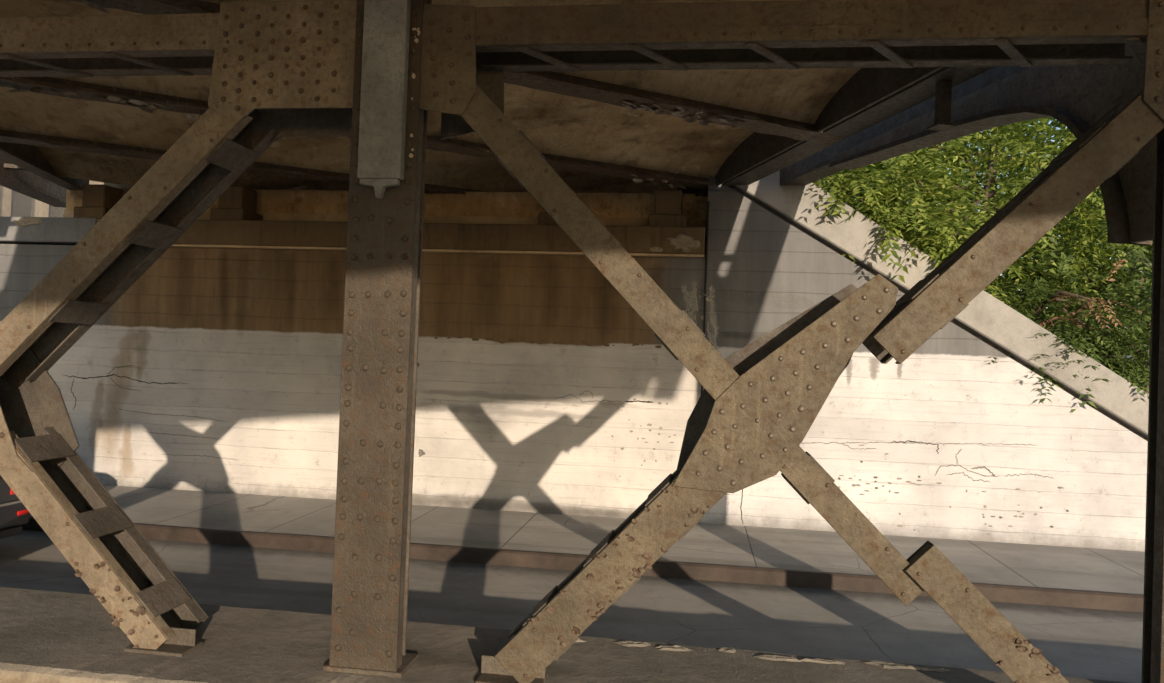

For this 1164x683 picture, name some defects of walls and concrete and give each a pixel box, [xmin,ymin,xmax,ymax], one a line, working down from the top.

leakage [682,282,719,349]
crack [65,365,236,460]
crack [801,440,1053,482]